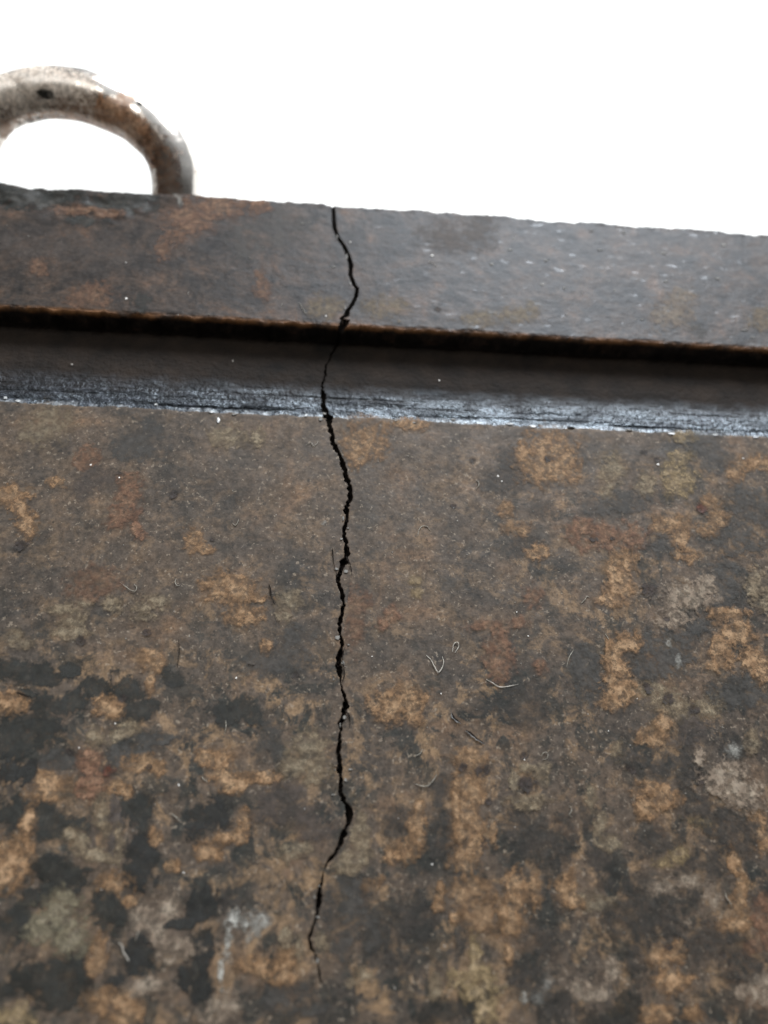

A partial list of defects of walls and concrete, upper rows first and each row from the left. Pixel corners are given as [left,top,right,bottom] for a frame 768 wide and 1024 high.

rust [196,566,304,626]
crack [308,207,359,985]
rust [564,429,768,688]
rust [364,679,430,729]
rust [594,628,727,764]
rust [20,883,164,1024]
rust [0,692,207,965]
rust [192,727,333,865]
rust [330,793,429,895]
rust [429,746,621,1024]
rust [638,939,707,1024]
rust [642,728,768,933]